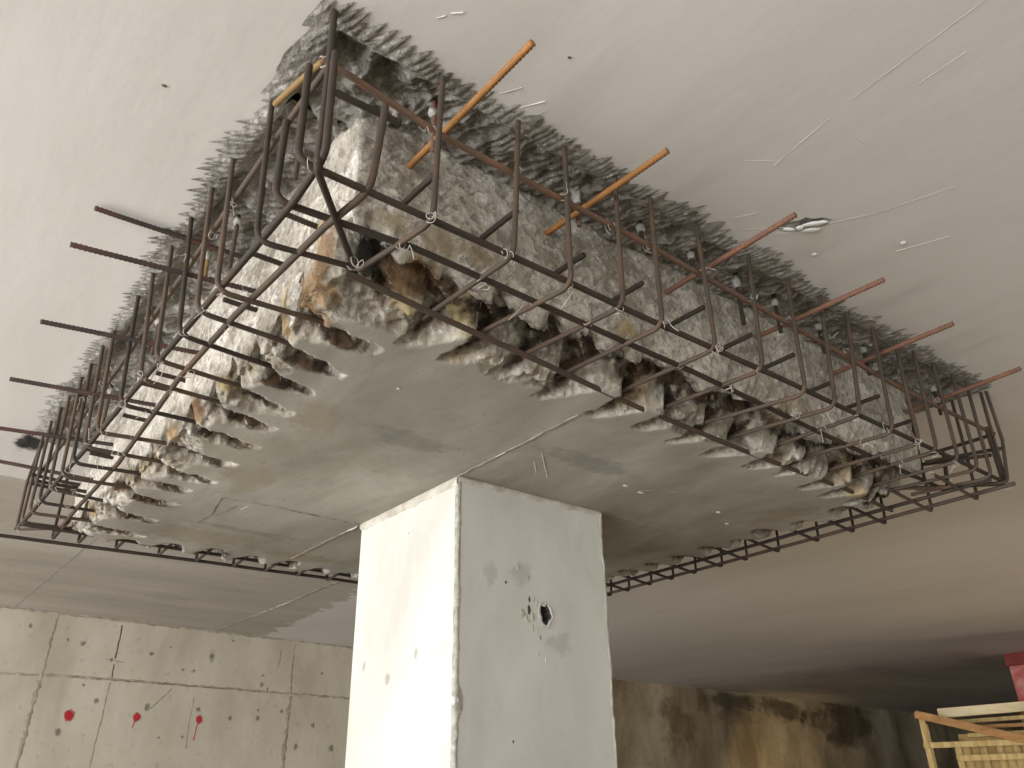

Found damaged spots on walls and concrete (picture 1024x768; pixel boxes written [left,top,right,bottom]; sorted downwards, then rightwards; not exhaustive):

rust [407,39,536,169]
rust [544,148,670,236]
rust [299,221,360,350]
rust [285,352,330,375]
rust [374,250,829,466]
rust [219,373,306,409]
rust [192,398,249,449]
rust [222,406,266,429]
rust [112,466,210,507]
spalling [71,217,921,768]
leakage [698,690,805,723]
leakage [822,702,871,746]